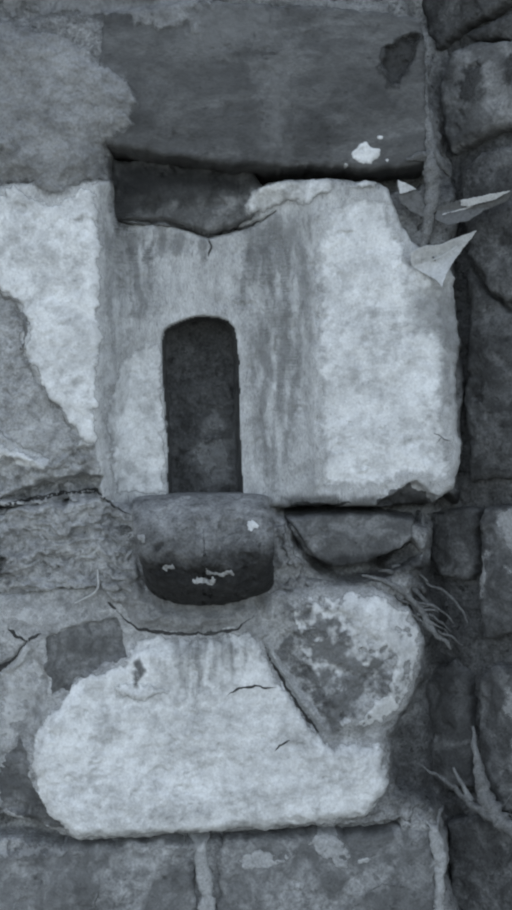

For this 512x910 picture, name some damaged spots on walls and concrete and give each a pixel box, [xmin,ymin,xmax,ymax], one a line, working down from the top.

water stain [114,169,249,313]
water stain [193,413,230,484]
crack [0,629,41,672]